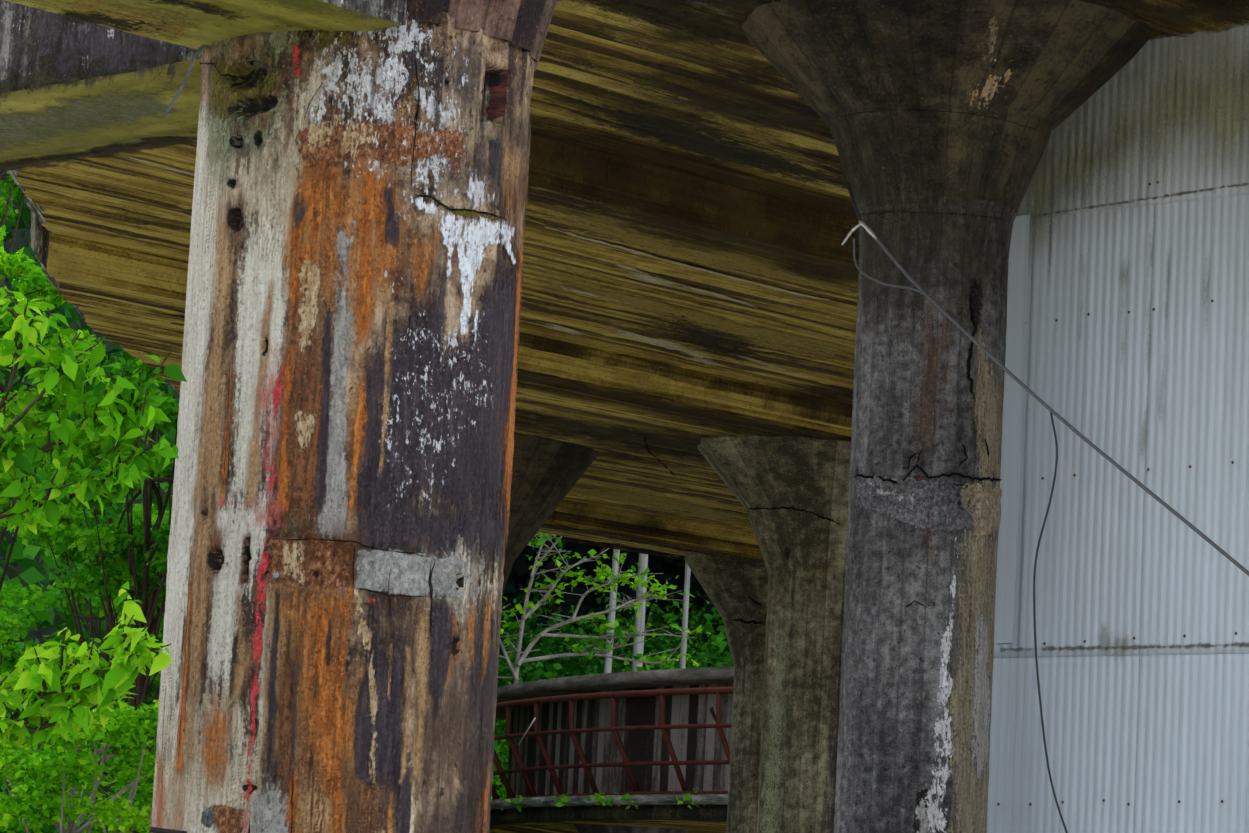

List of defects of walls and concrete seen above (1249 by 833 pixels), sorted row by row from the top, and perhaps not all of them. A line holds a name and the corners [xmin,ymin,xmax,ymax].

peeling [484,72,511,126]
leakage [1043,183,1248,216]
rust [272,155,440,531]
crack [967,274,978,401]
rust [155,203,234,831]
spalling [151,30,498,833]
leakage [254,0,1026,833]
crack [852,439,1002,484]
spalling [855,474,1002,540]
rust [262,582,393,833]
leakage [1001,643,1249,651]
crack [288,784,296,833]